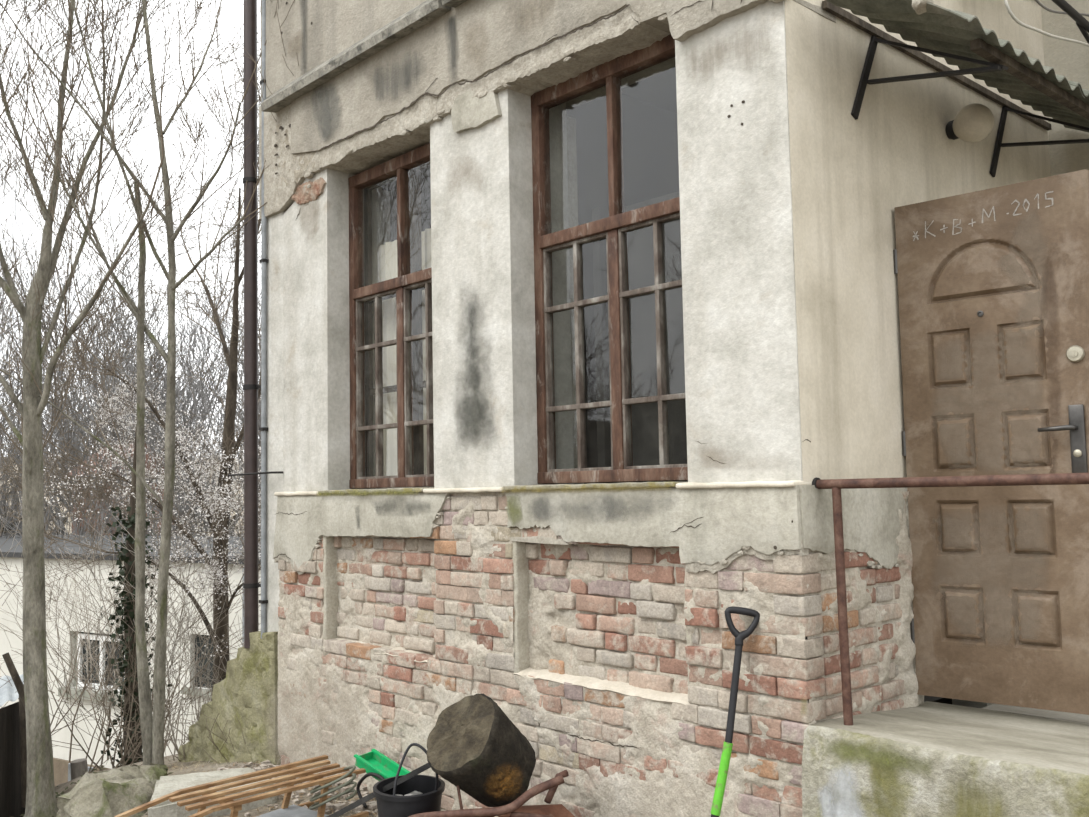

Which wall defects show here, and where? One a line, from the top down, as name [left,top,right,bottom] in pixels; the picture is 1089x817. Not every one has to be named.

spalling [274,7,669,205]
crack [321,4,642,149]
damp [464,312,483,432]
spalling [278,537,324,624]
spalling [431,493,521,607]
spalling [684,545,826,723]
damp [821,774,860,817]